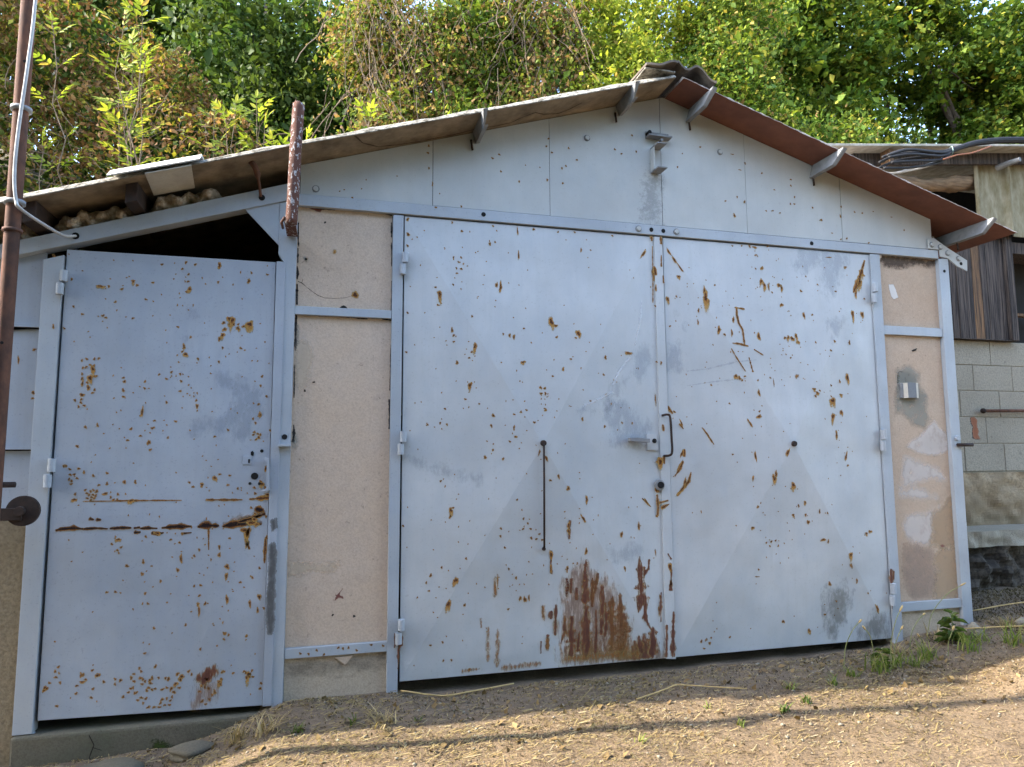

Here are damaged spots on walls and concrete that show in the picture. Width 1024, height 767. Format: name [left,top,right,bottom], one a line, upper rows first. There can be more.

corrosion [160,261,253,343]
corrosion [640,236,740,346]
corrosion [73,357,100,410]
corrosion [84,367,177,451]
corrosion [158,316,271,442]
corrosion [770,270,865,479]
corrosion [55,454,269,647]
corrosion [480,496,677,670]
corrosion [70,664,262,709]